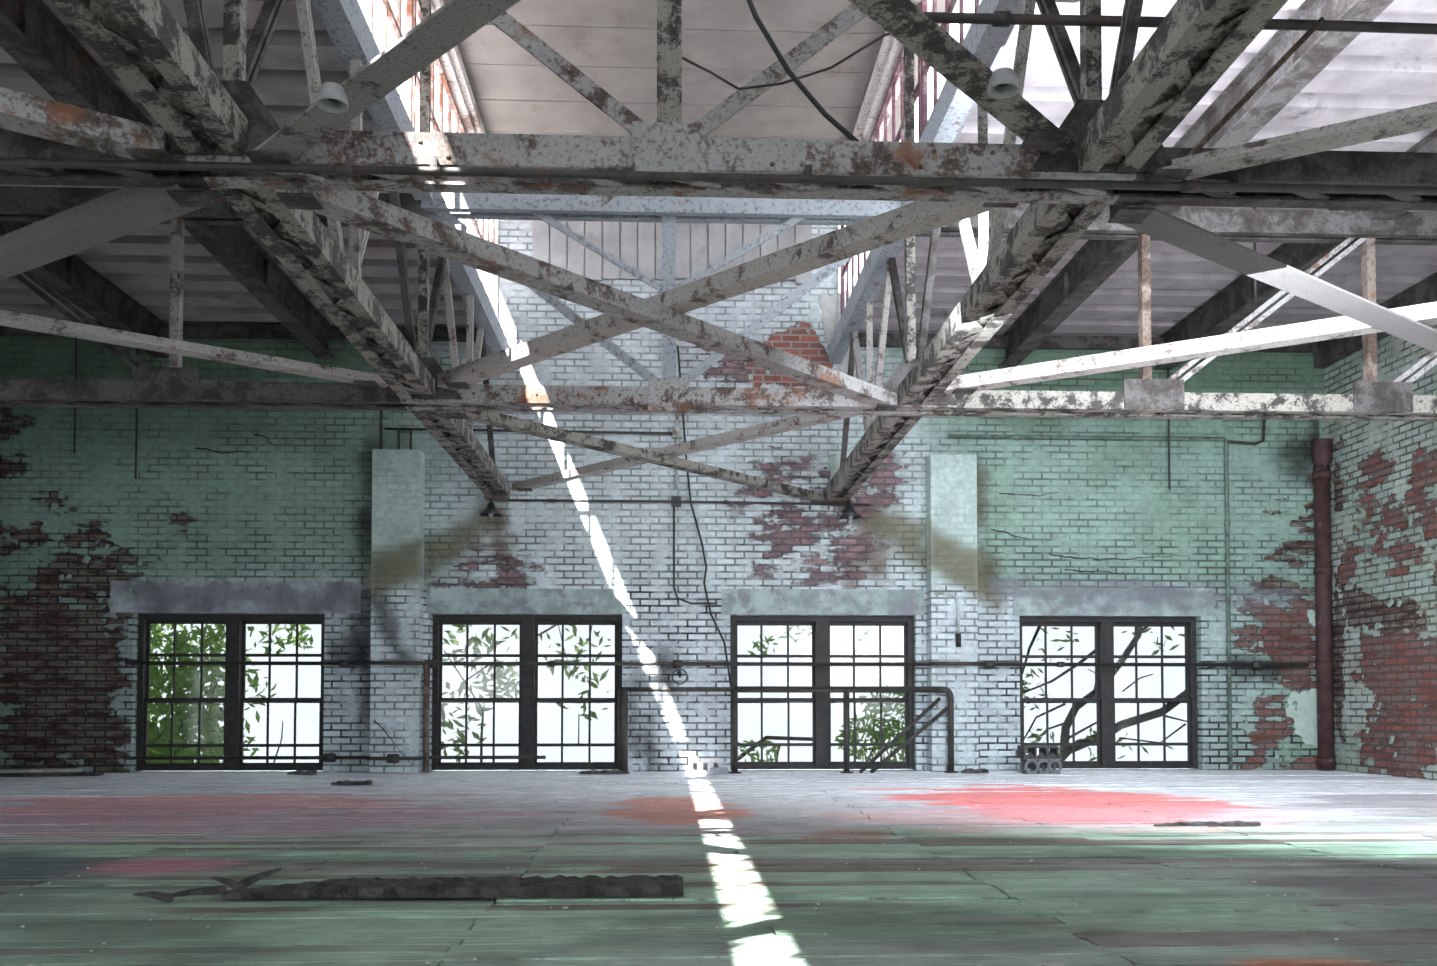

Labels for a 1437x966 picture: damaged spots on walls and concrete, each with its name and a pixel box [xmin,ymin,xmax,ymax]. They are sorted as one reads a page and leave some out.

peeling [693,346,818,388]
spalling [764,321,833,368]
peeling [0,406,41,487]
peeling [165,512,197,533]
peeling [727,441,910,589]
peeling [0,491,162,772]
peeling [1231,436,1437,779]